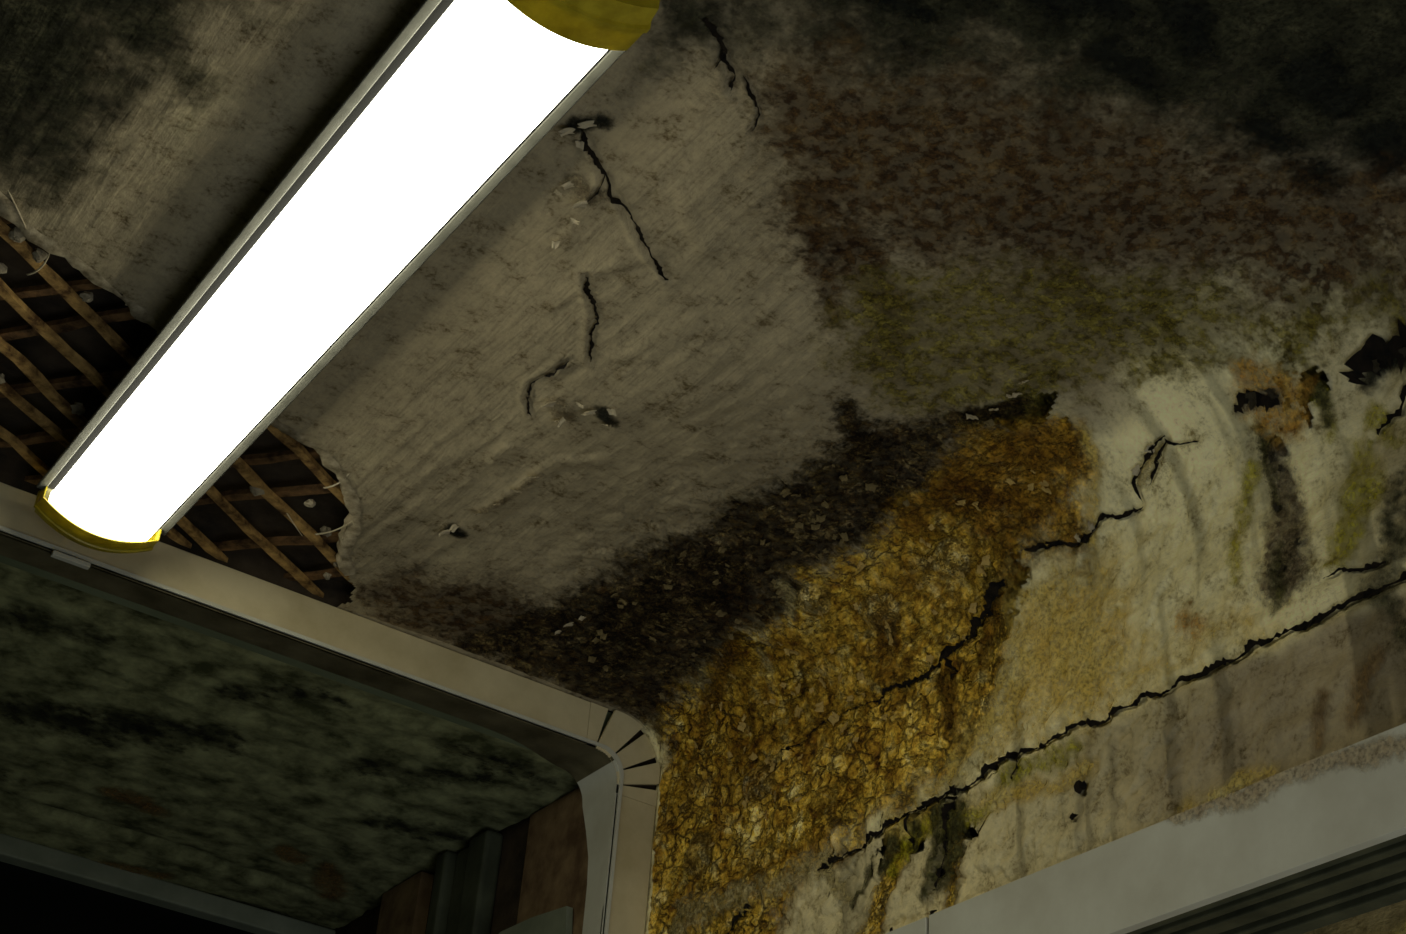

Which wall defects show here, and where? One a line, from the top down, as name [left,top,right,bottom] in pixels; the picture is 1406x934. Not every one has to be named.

water stain [743,38,1406,372]
spalling [0,191,162,500]
spalling [153,419,361,607]
corrosion [685,641,743,774]
water stain [355,398,1144,934]
crack [781,579,1006,752]
corrosion [901,426,1091,745]
crack [1024,435,1198,552]
crack [817,561,1406,891]
peeling [1234,387,1280,414]
water stain [1250,424,1312,614]
peeling [1339,319,1406,390]